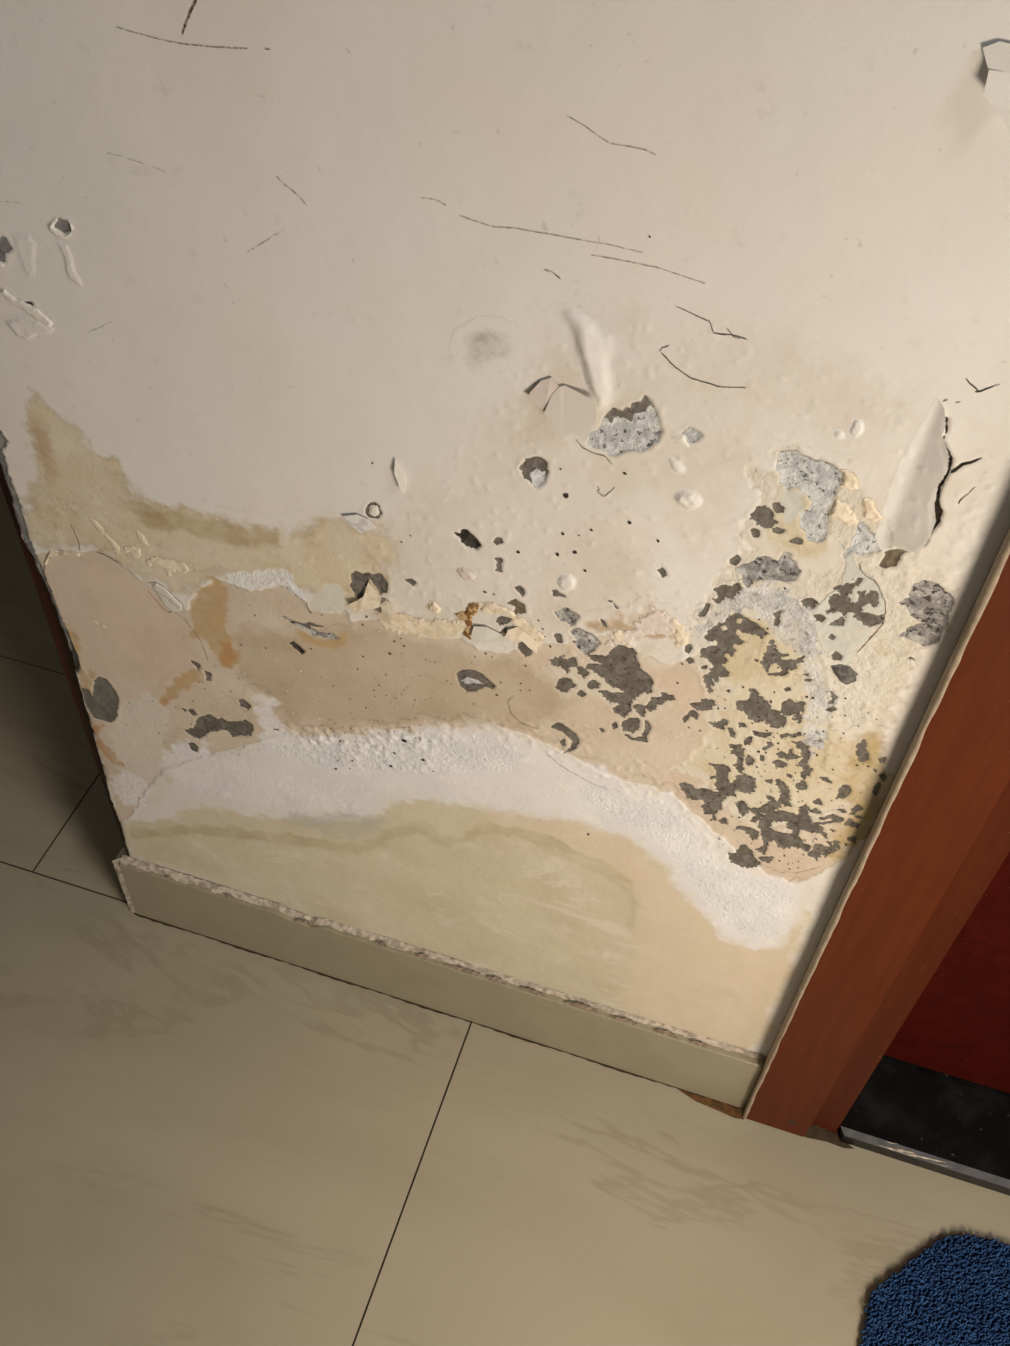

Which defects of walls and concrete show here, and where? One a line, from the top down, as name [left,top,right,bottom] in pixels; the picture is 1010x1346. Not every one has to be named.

peeling [983,41,1010,133]
peeling [0,237,12,269]
peeling [47,217,75,239]
water stain [8,210,1010,710]
peeling [527,377,703,456]
crack [931,379,1000,534]
flaking render [0,431,968,882]
water stain [106,638,828,1054]
water stain [811,718,902,870]